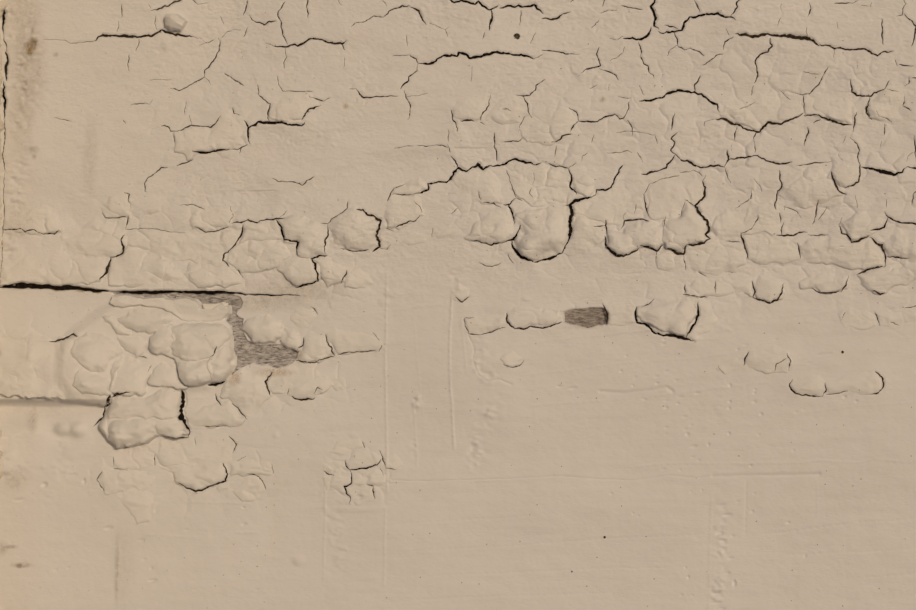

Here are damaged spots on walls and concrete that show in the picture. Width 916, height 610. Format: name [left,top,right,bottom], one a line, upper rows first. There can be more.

crack [0,0,916,341]
peeling [110,292,298,375]
peeling [564,308,608,328]